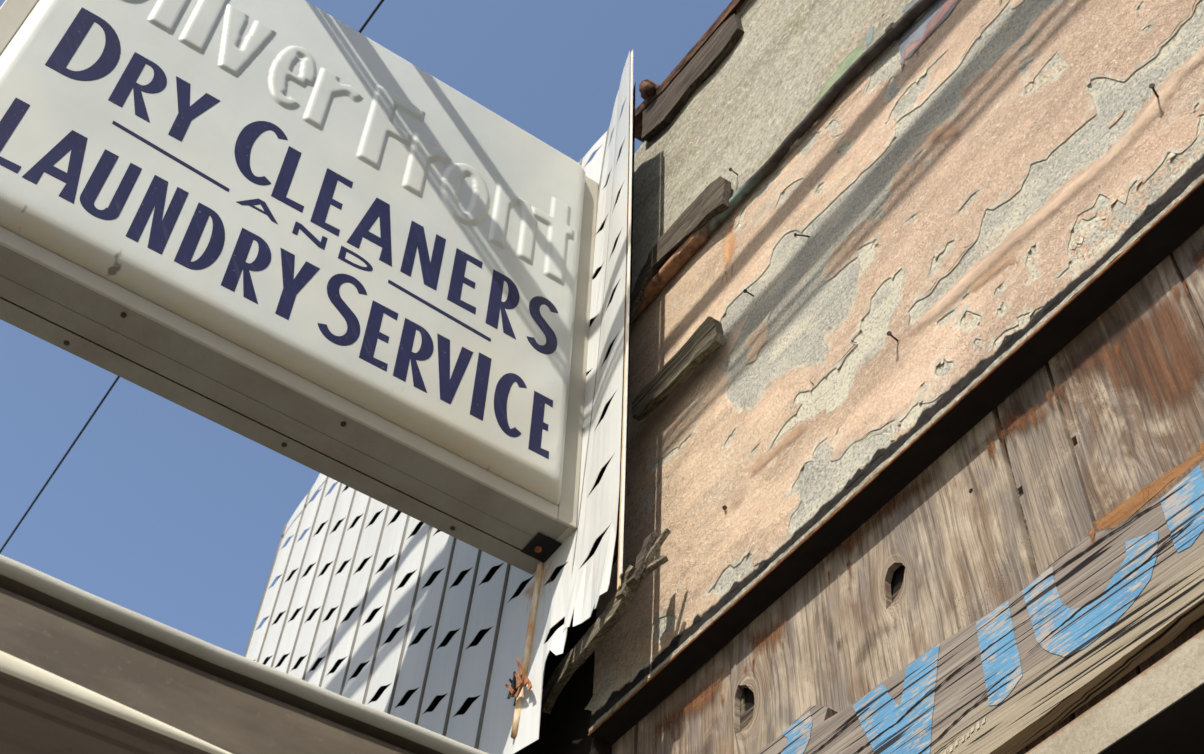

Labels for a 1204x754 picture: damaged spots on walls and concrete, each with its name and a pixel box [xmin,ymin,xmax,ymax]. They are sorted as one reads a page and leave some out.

peeling [720,0,1204,444]
peeling [709,549,760,594]
peeling [789,355,953,536]
crack [811,478,1196,754]
rust [1088,442,1204,544]